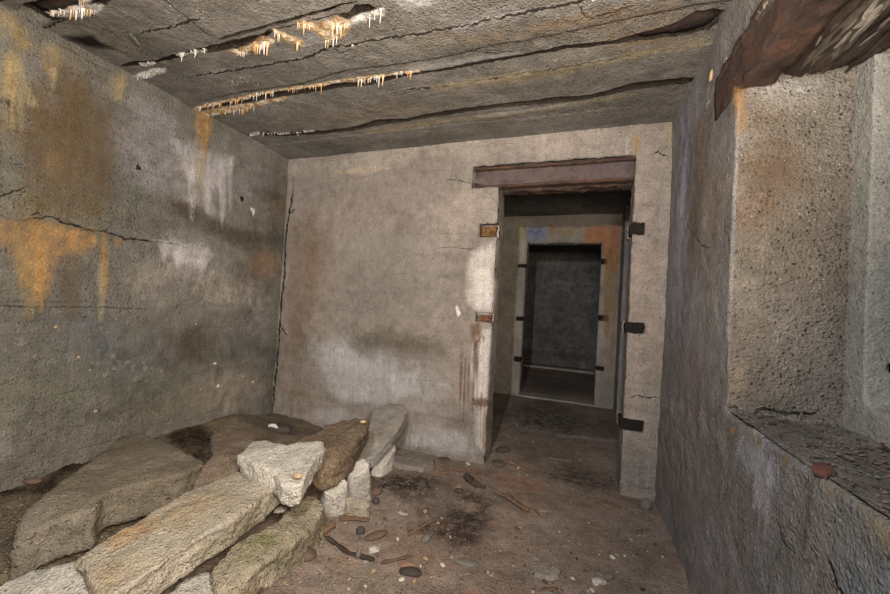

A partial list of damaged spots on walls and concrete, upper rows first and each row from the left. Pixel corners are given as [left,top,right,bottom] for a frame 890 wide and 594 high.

crack [0,0,112,29]
crack [122,0,732,109]
crack [247,77,693,136]
crack [19,212,188,248]
crack [272,181,295,413]
corrosion [460,324,487,410]